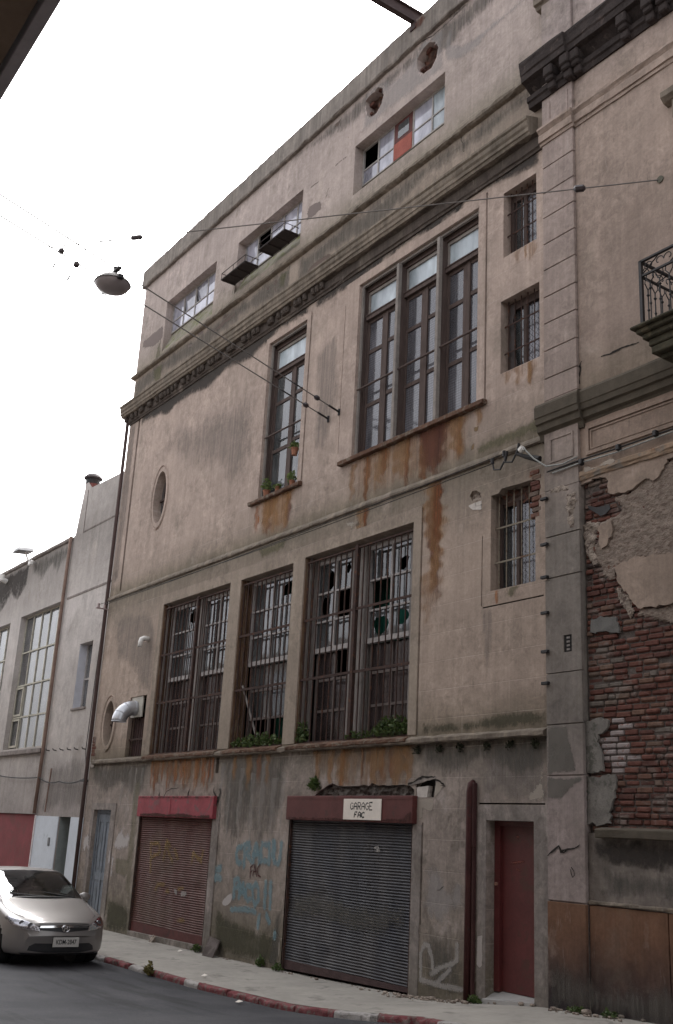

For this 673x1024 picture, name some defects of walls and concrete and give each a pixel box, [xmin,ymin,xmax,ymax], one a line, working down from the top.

crack [579,342,639,384]
corrosion [351,416,462,589]
flaking render [469,491,482,510]
flaking render [502,469,541,520]
flaking render [580,452,673,833]
flaking render [317,777,444,819]
crack [547,844,580,878]